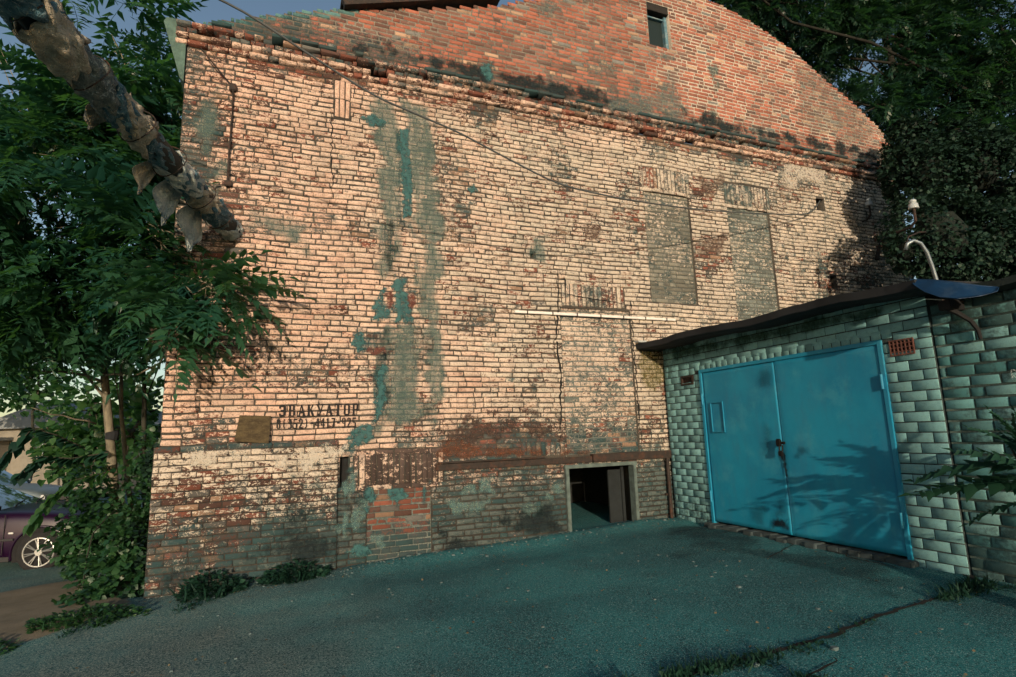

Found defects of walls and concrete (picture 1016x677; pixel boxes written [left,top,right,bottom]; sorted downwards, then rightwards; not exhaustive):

damp [408,55,609,103]
damp [683,107,881,159]
damp [370,99,445,432]
crack [554,270,642,453]